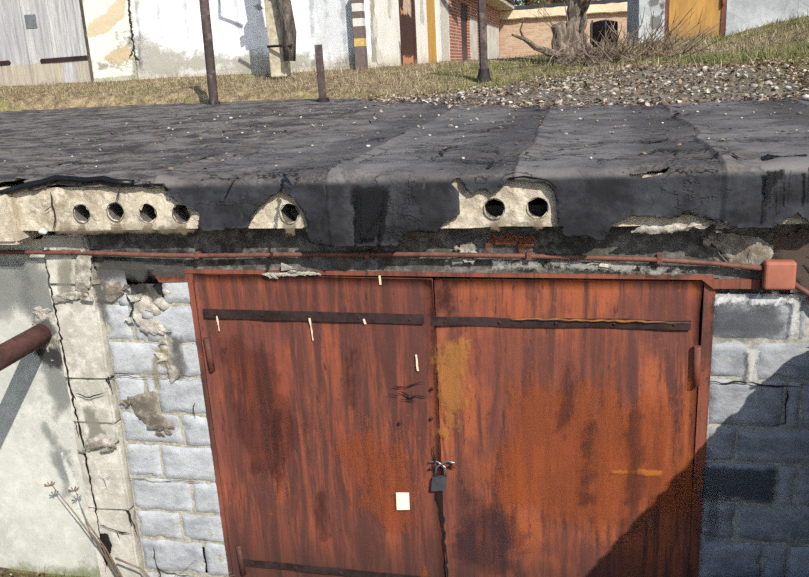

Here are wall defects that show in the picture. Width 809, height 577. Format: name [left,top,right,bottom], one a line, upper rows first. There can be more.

peeling [83,0,135,78]
crack [128,0,139,66]
peeling [400,0,411,16]
crack [25,125,284,205]
crack [44,192,56,232]
spalling [31,246,181,383]
crack [44,258,203,577]
spalling [119,391,175,436]